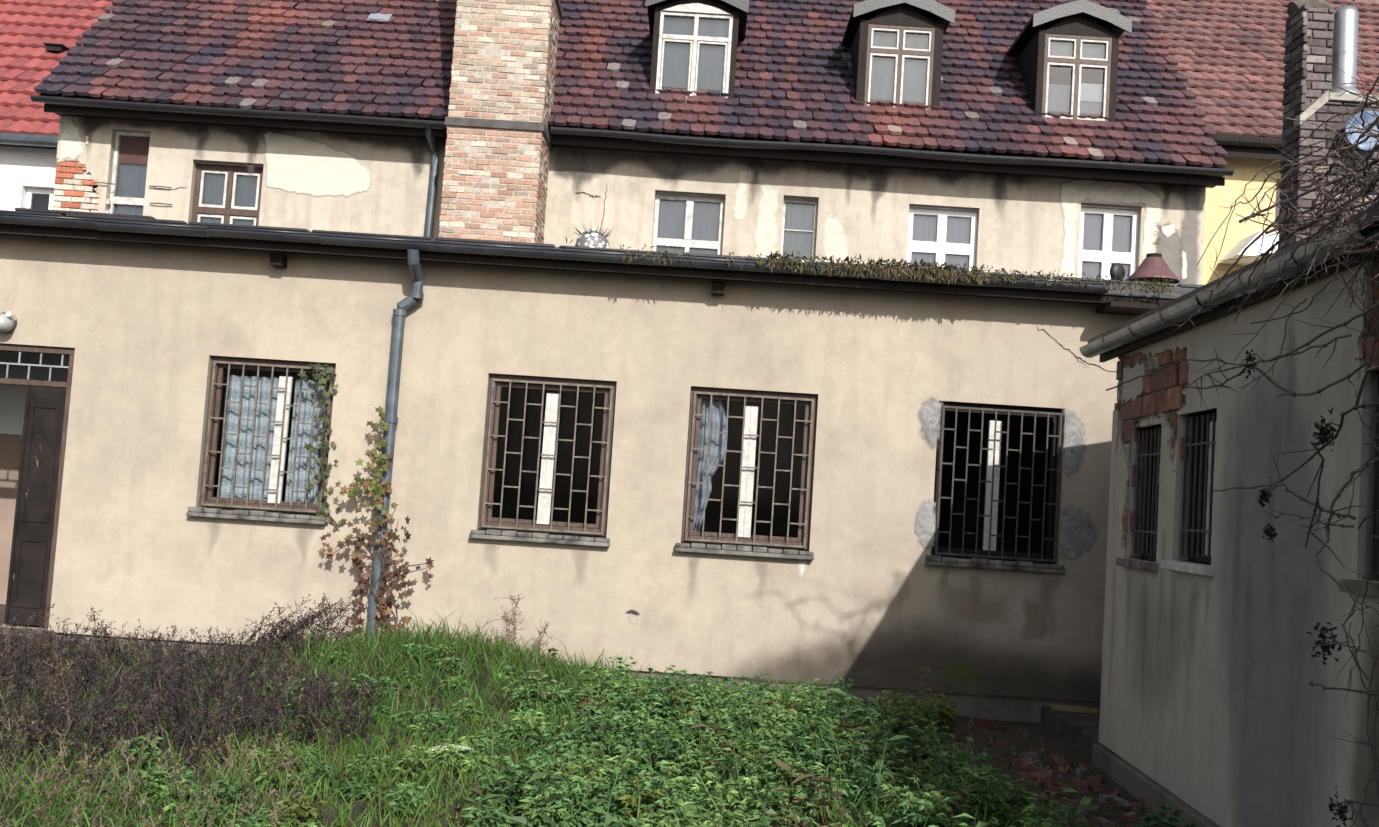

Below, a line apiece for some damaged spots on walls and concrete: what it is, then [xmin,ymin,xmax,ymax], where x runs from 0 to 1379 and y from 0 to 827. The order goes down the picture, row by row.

spalling [52,116,111,213]
damp [734,159,778,258]
damp [823,218,848,263]
damp [848,165,886,199]
damp [994,175,1005,201]
spalling [1114,348,1189,531]
damp [1231,395,1317,827]
damp [745,638,1101,703]